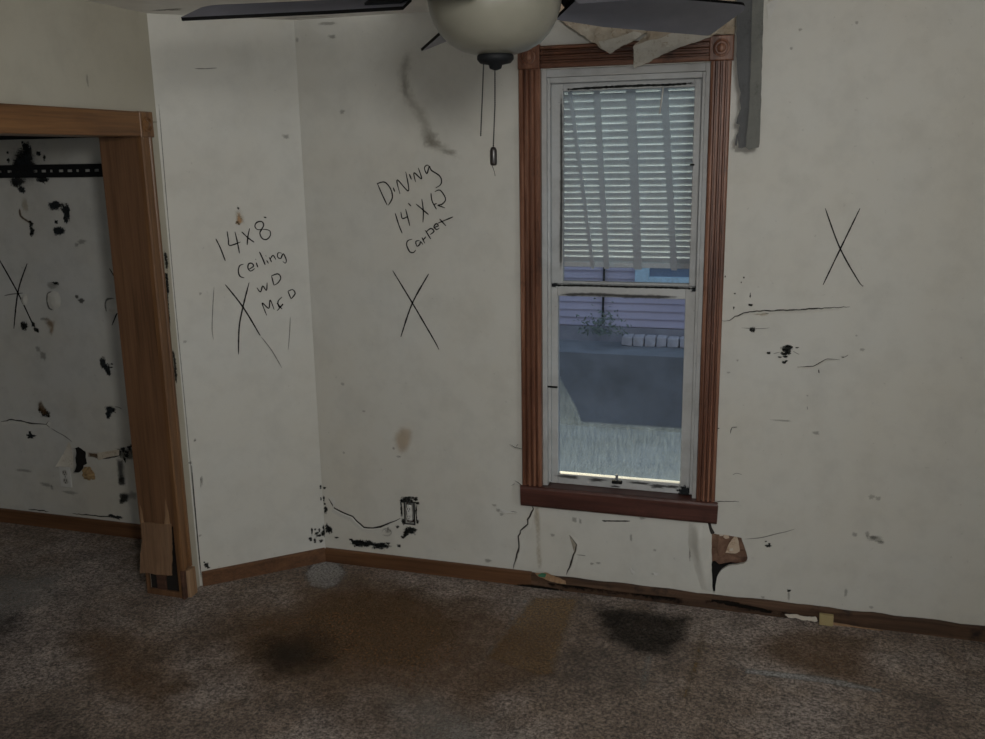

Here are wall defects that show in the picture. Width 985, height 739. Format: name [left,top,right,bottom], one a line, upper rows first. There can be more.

crack [722,276,850,324]
spalling [55,442,119,480]
crack [566,534,585,576]
spalling [712,534,747,591]